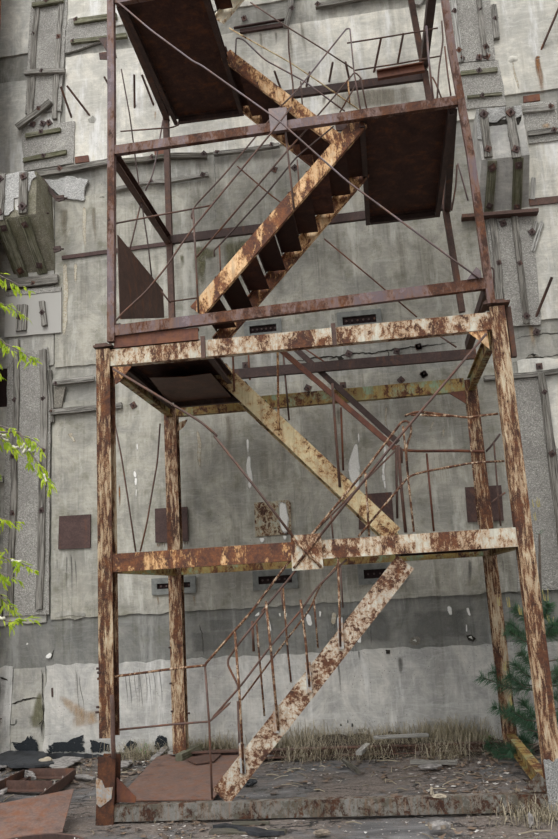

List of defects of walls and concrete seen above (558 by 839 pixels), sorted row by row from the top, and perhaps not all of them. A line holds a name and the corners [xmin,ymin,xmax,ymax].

peeling [11,736,38,751]
peeling [48,735,110,775]
peeling [395,753,527,795]